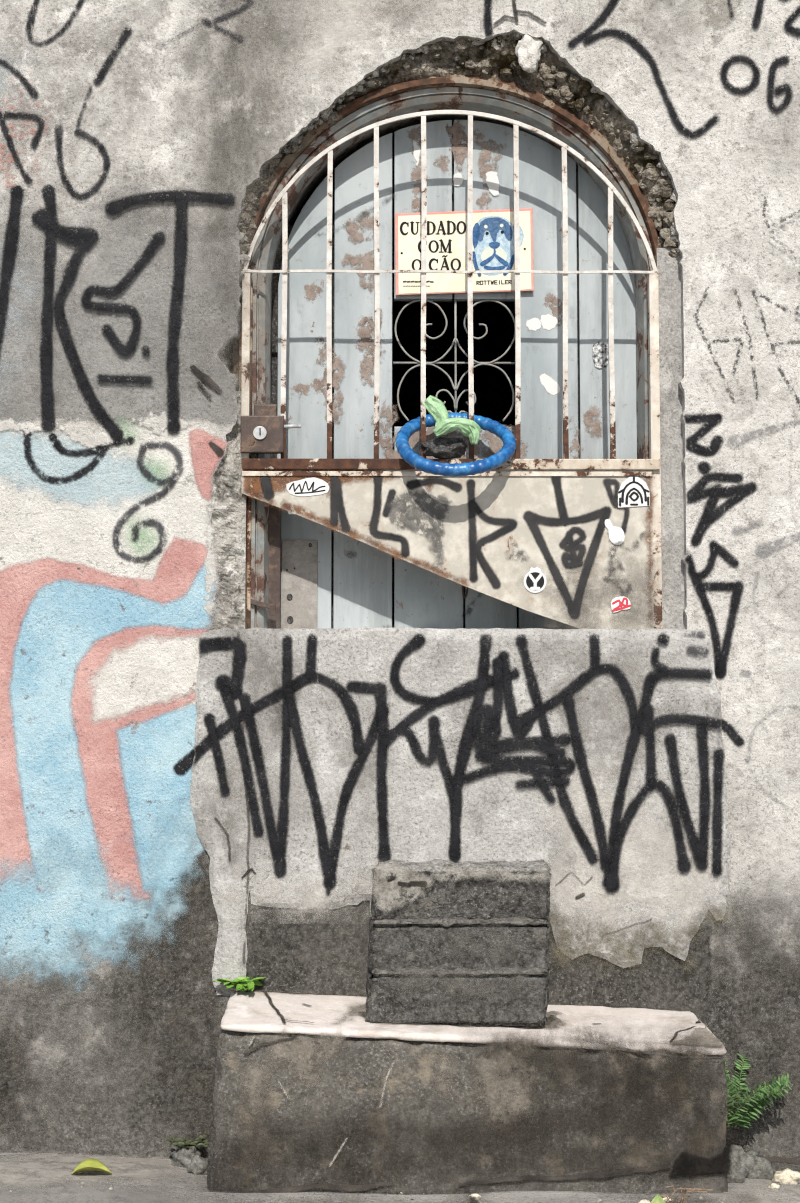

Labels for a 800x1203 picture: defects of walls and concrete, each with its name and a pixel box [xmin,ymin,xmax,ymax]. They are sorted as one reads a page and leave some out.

crack [493,0,546,26]
spalling [237,32,680,291]
peeling [304,284,322,300]
spalling [219,339,233,373]
peeling [0,418,44,436]
peeling [59,421,113,448]
peeling [132,411,190,435]
spalling [200,391,246,630]
corrosion [243,469,467,585]
damp [0,857,222,1186]
peeling [546,917,724,1046]
damp [706,922,800,1203]